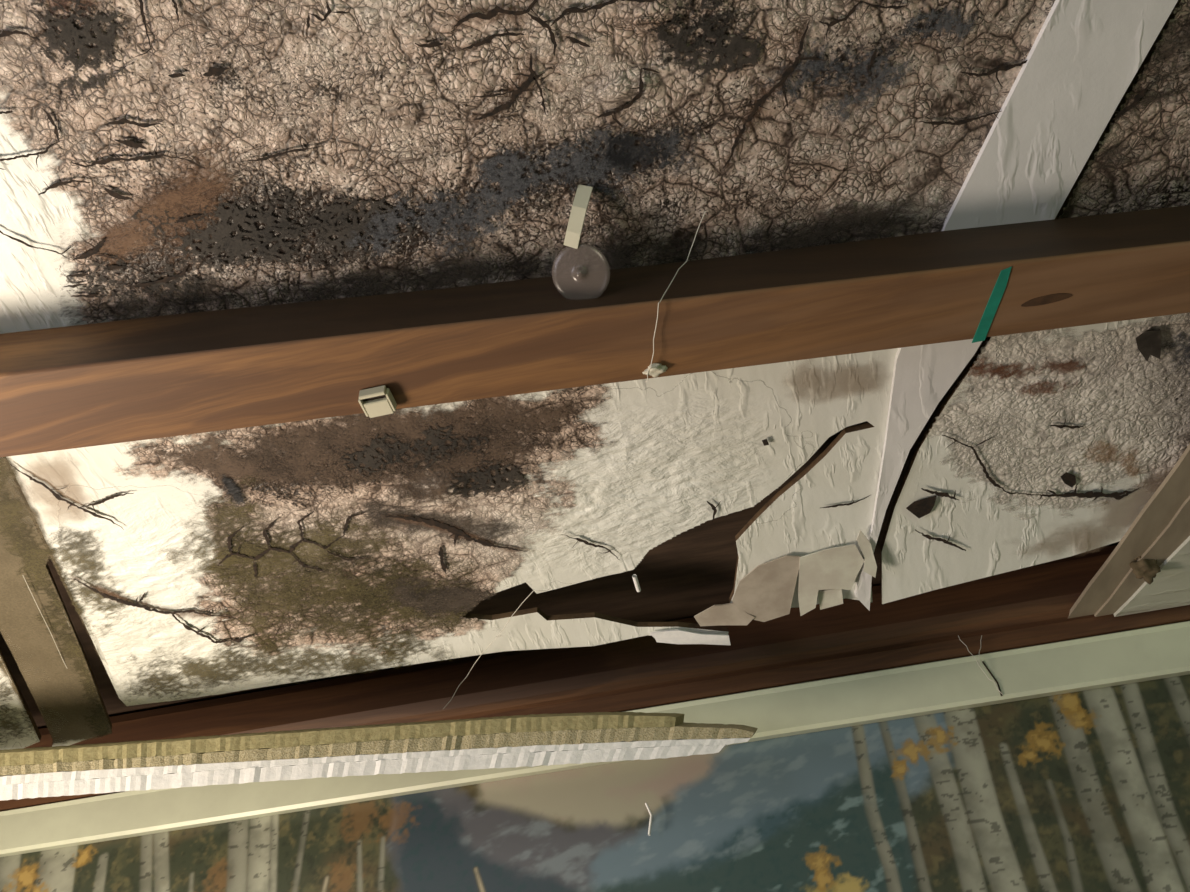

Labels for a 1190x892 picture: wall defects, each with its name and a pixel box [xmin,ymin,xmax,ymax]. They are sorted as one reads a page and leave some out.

crack [133,0,229,78]
crack [415,0,656,121]
crack [0,109,205,201]
damp [0,0,1055,324]
damp [1058,0,1190,219]
crack [0,231,188,298]
damp [928,313,1190,519]
crack [10,464,133,530]
crack [74,579,261,644]
damp [117,384,612,699]
peeling [694,530,877,626]
crack [942,435,1139,501]